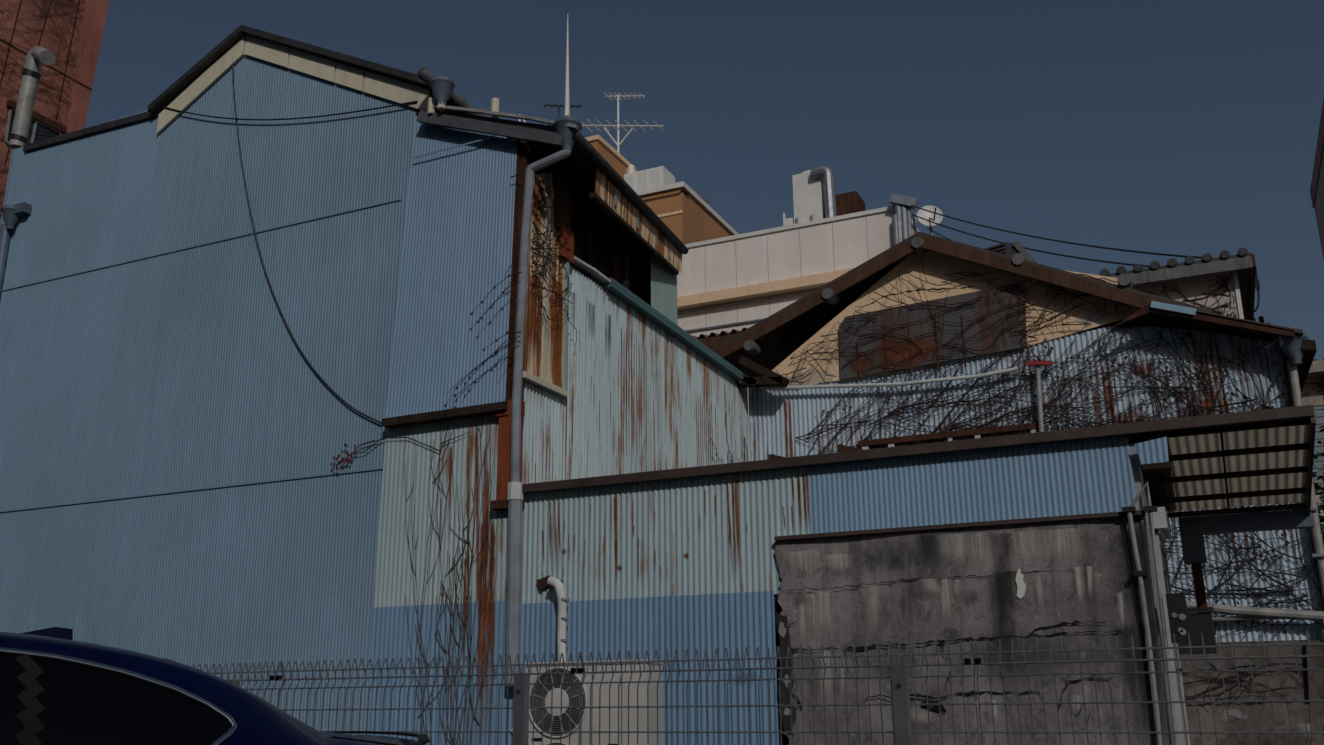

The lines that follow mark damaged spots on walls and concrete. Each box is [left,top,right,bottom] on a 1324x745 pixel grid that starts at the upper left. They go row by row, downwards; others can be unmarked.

corrosion [528,240,562,358]
corrosion [563,329,670,478]
corrosion [448,432,495,702]
corrosion [611,493,661,577]
corrosion [699,482,747,556]
corrosion [783,473,810,527]
water stain [924,579,958,610]
water stain [922,533,985,558]
crack [779,569,1143,721]
water stain [994,529,1074,666]
water stain [1075,567,1092,596]
water stain [1118,531,1160,721]